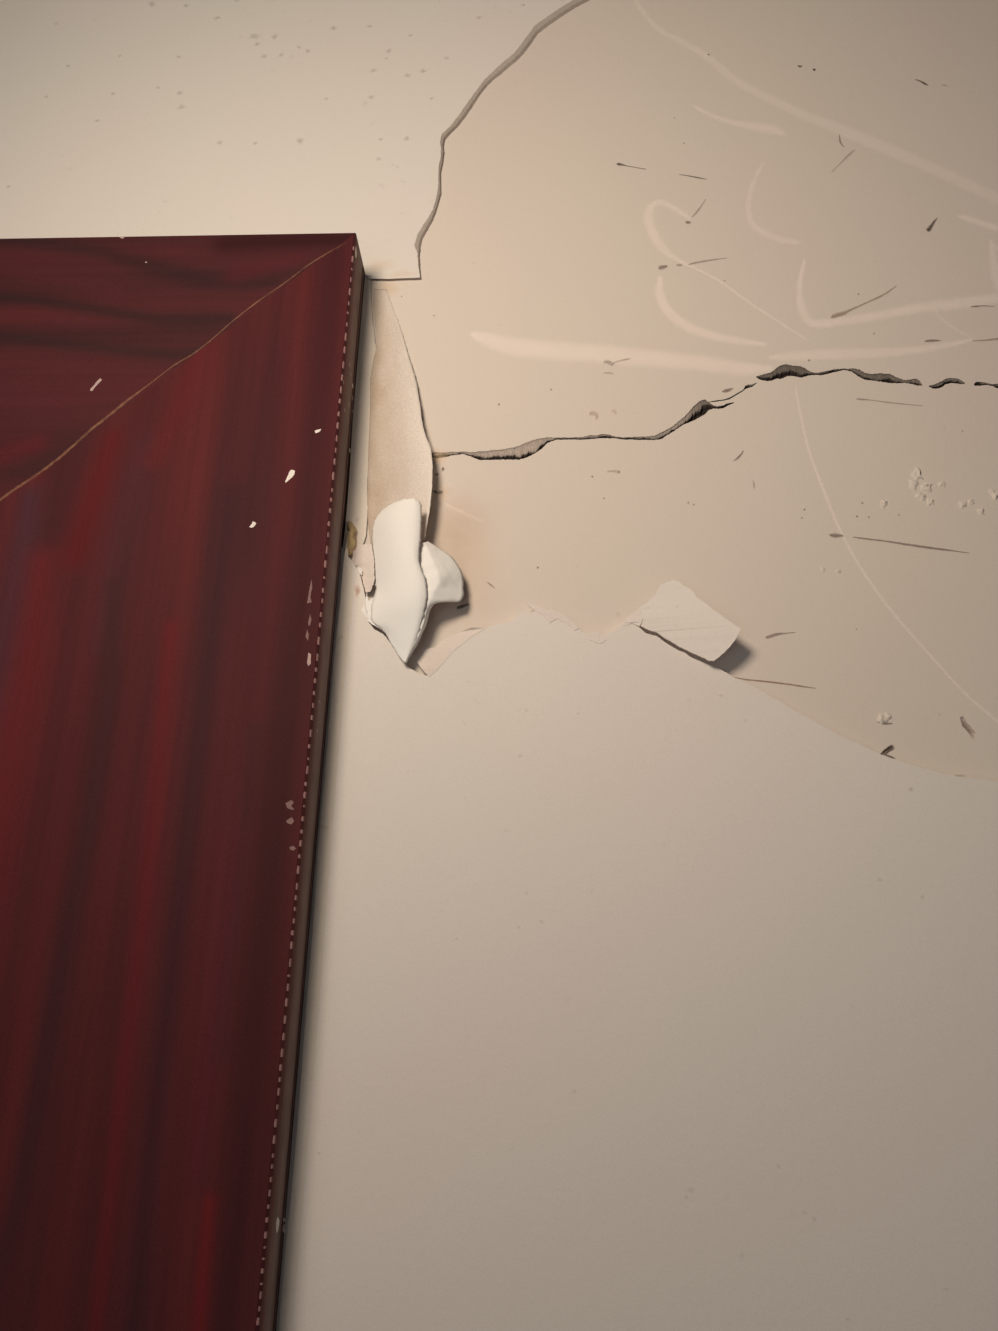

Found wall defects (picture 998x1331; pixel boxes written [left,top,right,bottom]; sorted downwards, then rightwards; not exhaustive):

peeling [349,0,998,782]
crack [432,364,998,460]